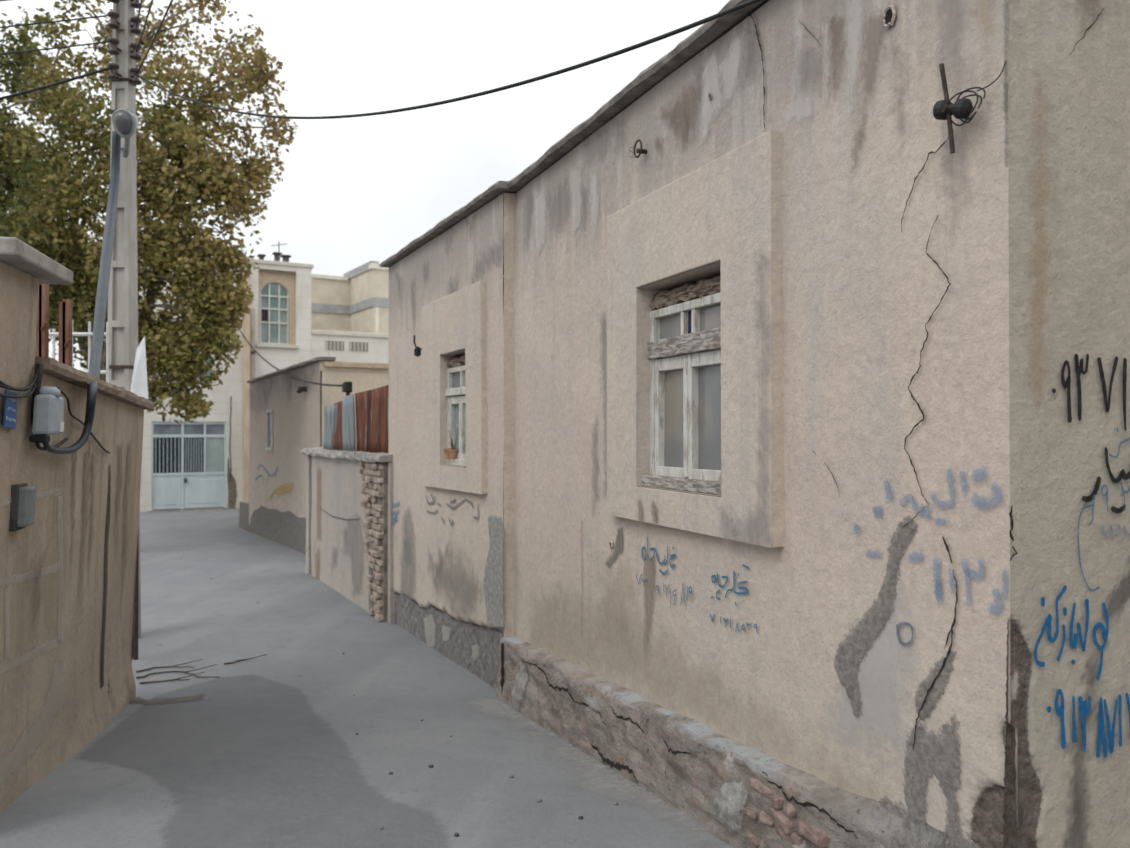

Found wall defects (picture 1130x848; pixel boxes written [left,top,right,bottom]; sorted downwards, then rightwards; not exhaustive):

crack [748,11,765,128]
damp [525,170,599,254]
crack [901,130,954,232]
crack [903,215,951,527]
crack [500,643,690,783]
crack [913,536,958,750]